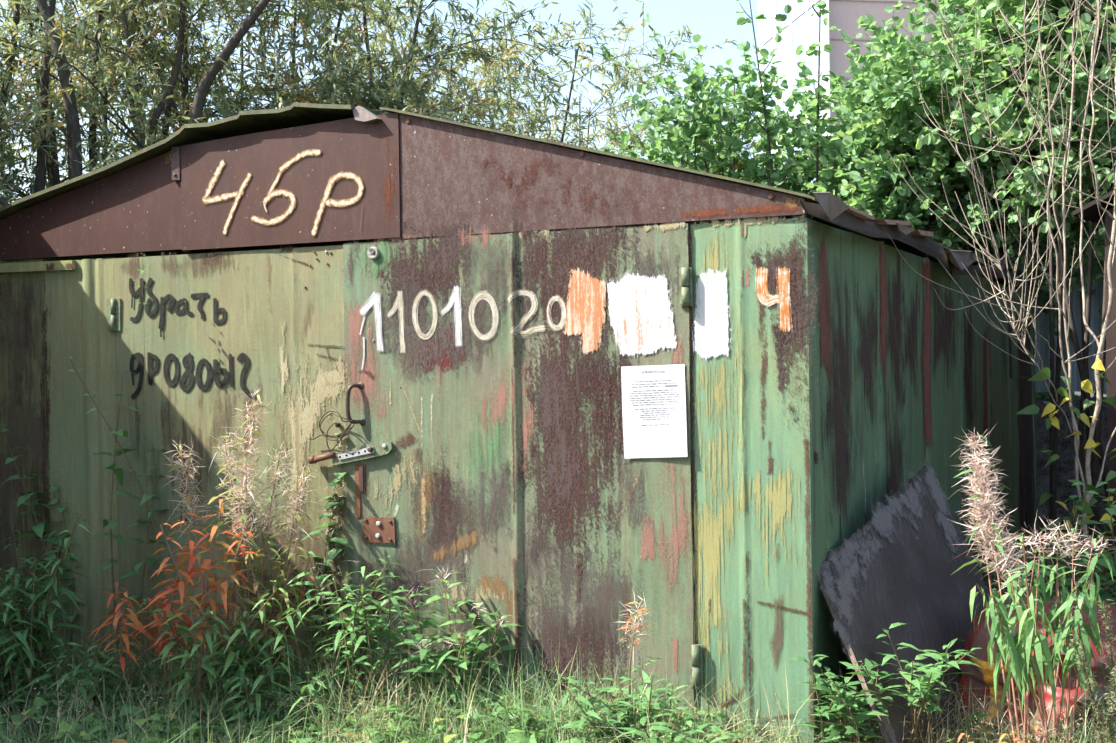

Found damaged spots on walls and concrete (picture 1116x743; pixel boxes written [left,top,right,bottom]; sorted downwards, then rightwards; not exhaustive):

corrosion [40,311,50,522]
corrosion [395,432,436,543]
corrosion [415,325,466,393]
corrosion [433,532,477,562]
corrosion [512,559,525,692]
peeling [279,155,805,732]
corrosion [682,196,976,729]
peeling [821,477,922,599]
peeling [876,243,887,425]
corrosion [1017,313,1036,544]